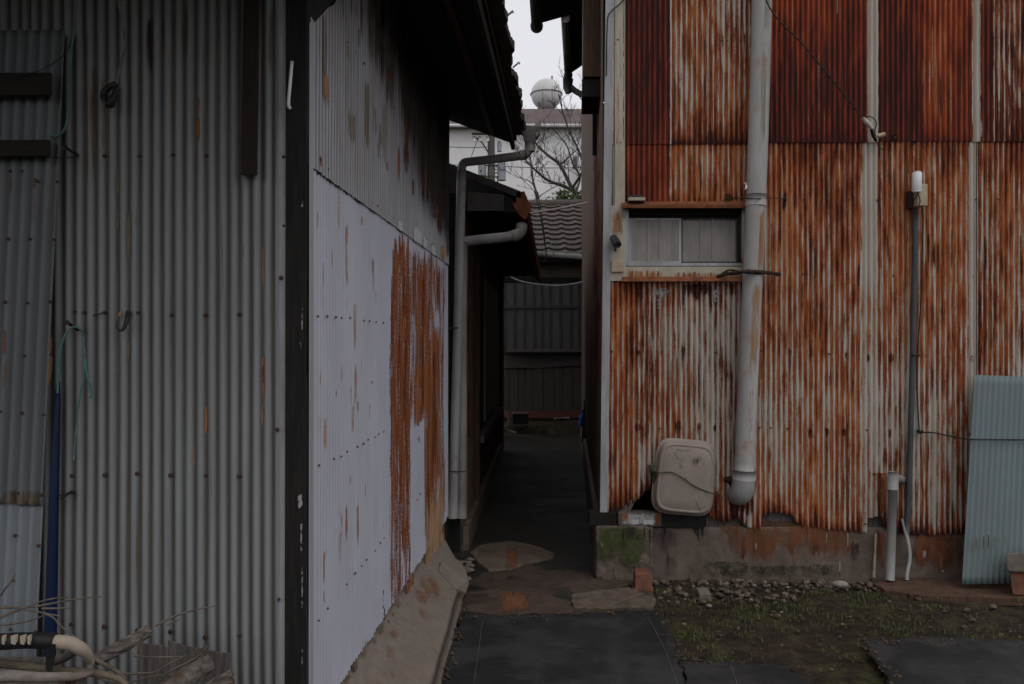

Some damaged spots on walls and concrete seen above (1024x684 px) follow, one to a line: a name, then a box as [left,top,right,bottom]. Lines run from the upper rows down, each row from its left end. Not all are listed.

rust [383,112,449,635]
rust [593,0,1024,572]